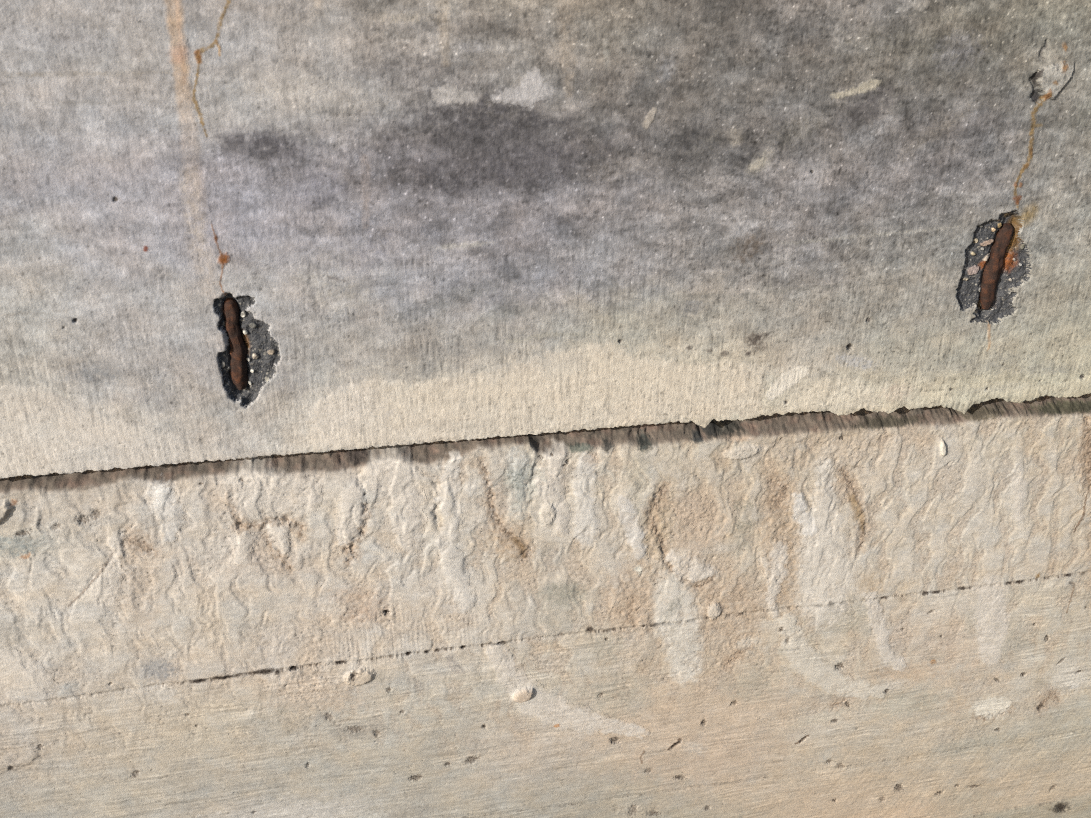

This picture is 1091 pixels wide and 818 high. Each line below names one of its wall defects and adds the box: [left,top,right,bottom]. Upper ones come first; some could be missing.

crack [190,0,232,139]
crack [1010,40,1070,210]
crack [210,222,231,296]
spalling [956,210,1032,324]
spalling [214,293,281,408]